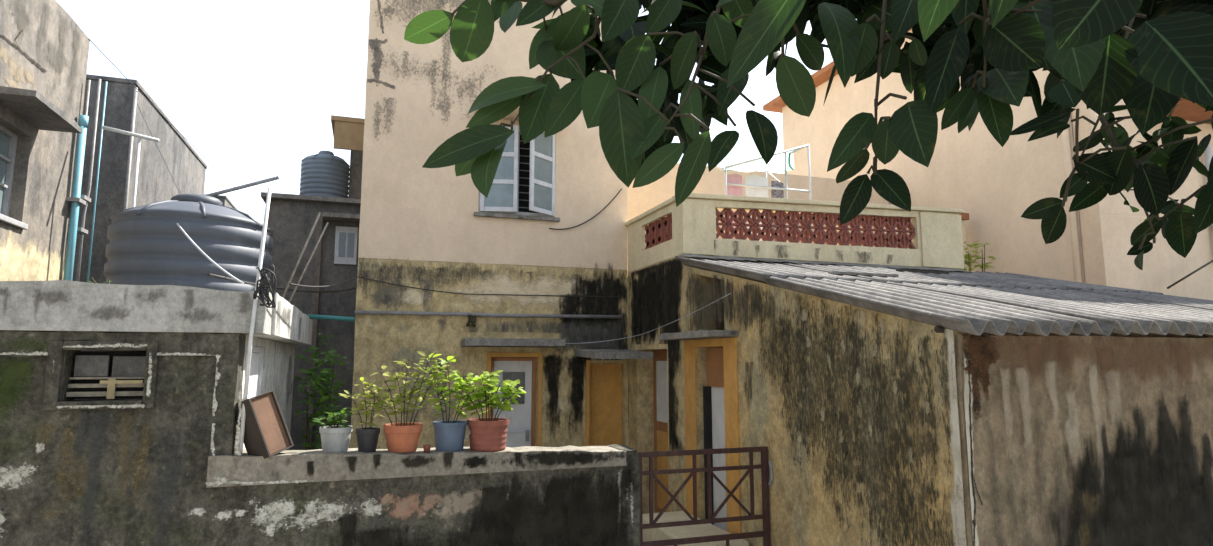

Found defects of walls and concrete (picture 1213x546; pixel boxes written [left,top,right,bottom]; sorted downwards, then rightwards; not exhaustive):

water stain [371,0,484,121]
water stain [373,97,394,138]
water stain [35,292,66,310]
water stain [92,308,126,320]
water stain [185,289,212,320]
water stain [358,260,499,312]
water stain [493,258,957,546]
peeling [0,442,45,493]
peeling [188,477,482,537]
water stain [339,451,635,546]